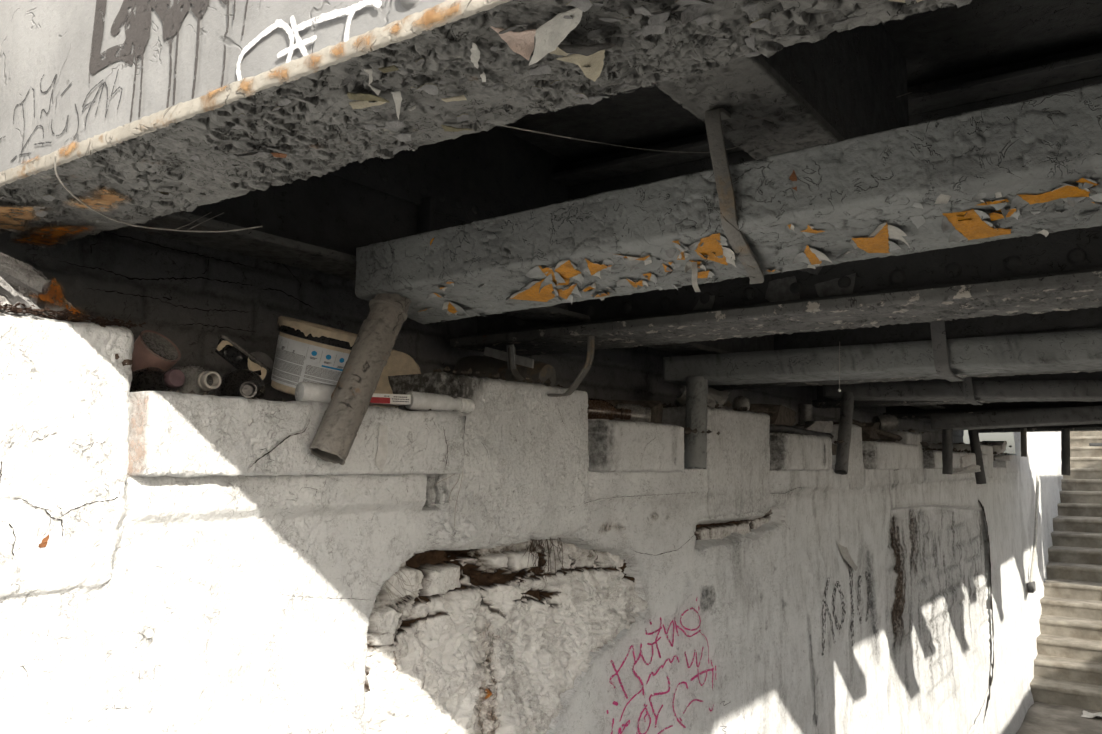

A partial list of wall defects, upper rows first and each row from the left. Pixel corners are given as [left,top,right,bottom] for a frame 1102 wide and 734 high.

rust [309,35,370,67]
peeling [341,0,713,155]
rust [0,207,90,247]
rust [74,189,126,210]
peeling [767,178,1102,273]
rust [31,279,83,320]
peeling [506,233,737,306]
crack [250,415,311,467]
crack [0,460,120,557]
damp [909,510,919,568]
spalling [364,539,650,734]
crack [978,500,994,719]